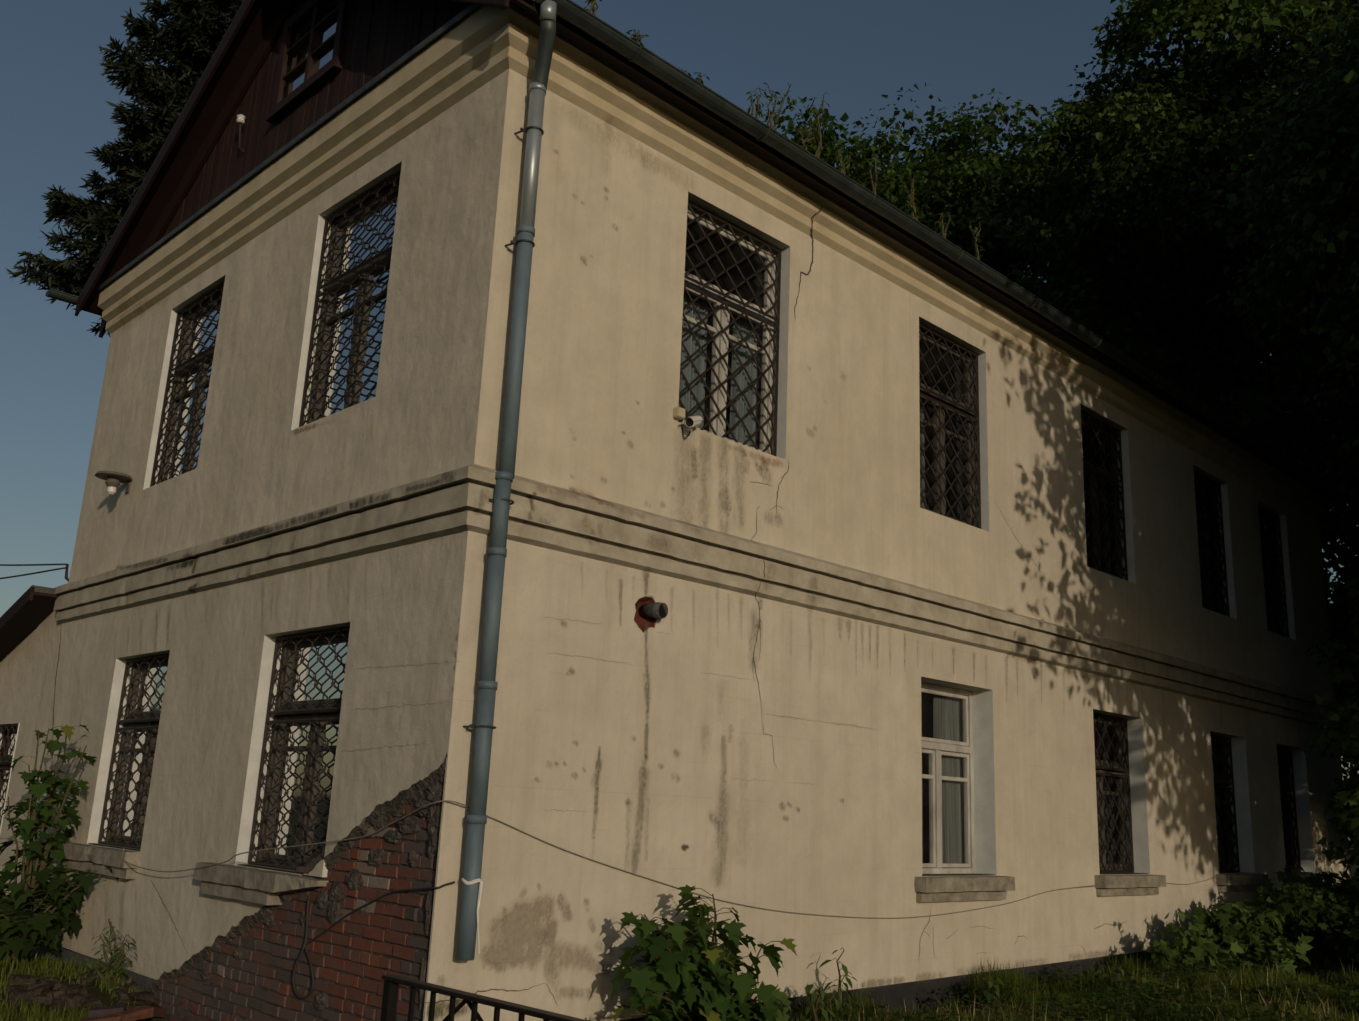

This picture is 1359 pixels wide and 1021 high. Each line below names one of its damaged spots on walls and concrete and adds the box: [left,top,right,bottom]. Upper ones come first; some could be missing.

crack [794,206,823,313]
crack [712,466,876,785]
flaking render [141,753,447,1021]